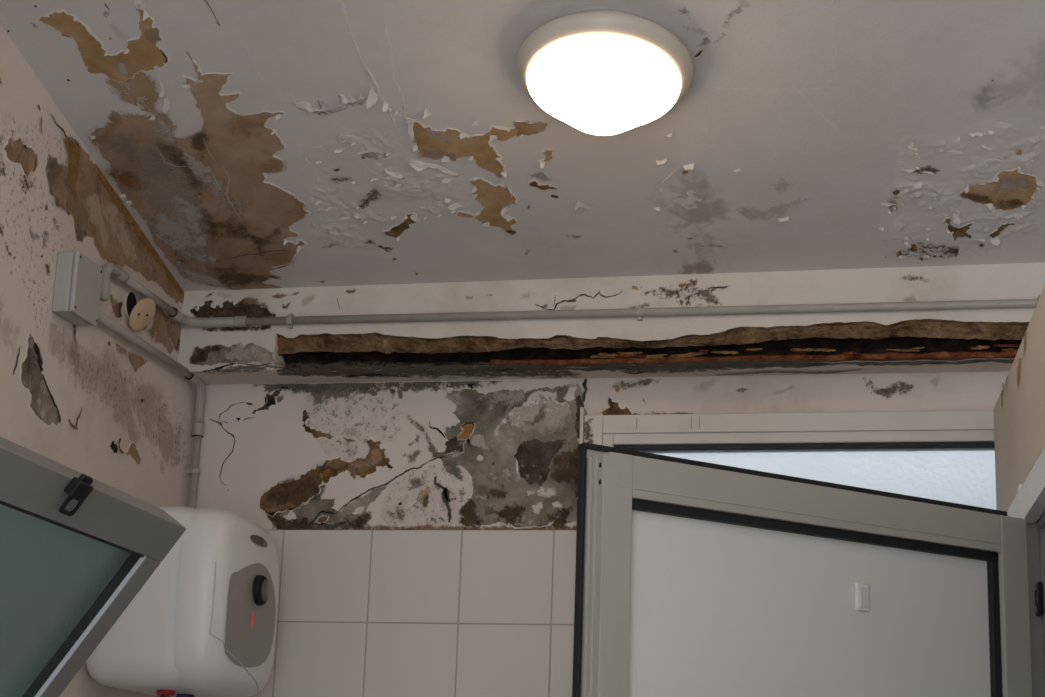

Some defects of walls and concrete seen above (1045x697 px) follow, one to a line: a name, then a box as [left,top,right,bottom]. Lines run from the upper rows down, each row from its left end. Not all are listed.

water stain [0,105,298,318]
peeling [38,7,311,290]
peeling [381,212,420,241]
peeling [405,118,547,234]
peeling [886,168,1045,261]
peeling [13,331,82,429]
peeling [110,438,141,466]
water stain [108,341,147,372]
water stain [149,305,181,352]
crack [210,402,255,491]
crack [535,290,623,310]
spalling [189,319,1029,530]